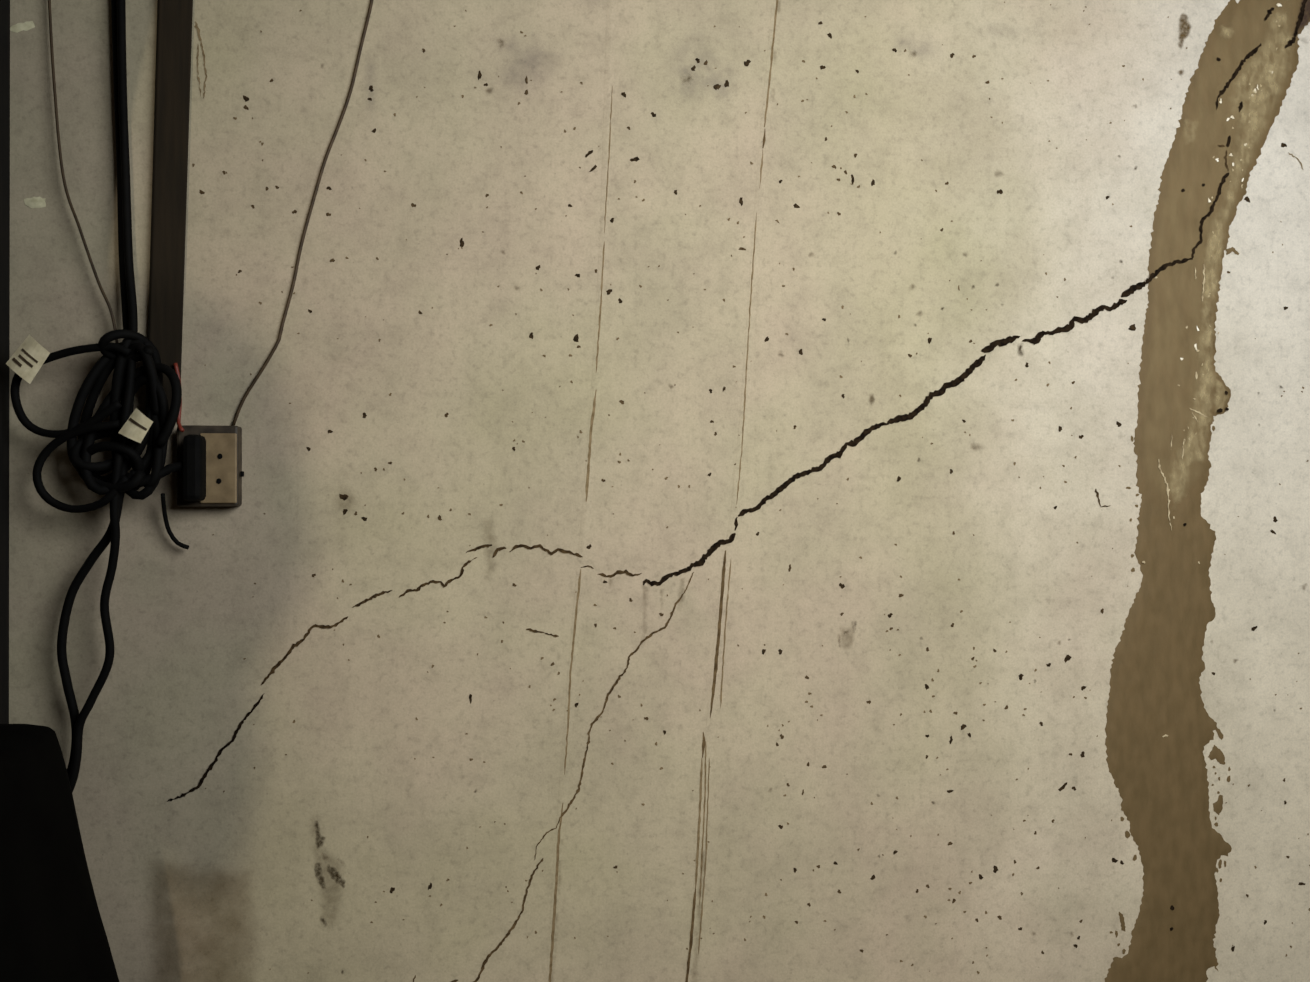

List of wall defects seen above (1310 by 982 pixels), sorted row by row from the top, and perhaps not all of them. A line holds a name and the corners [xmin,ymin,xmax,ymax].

crack [194,21,207,98]
damp [1179,15,1190,46]
crack [1215,0,1307,112]
crack [167,136,1231,982]